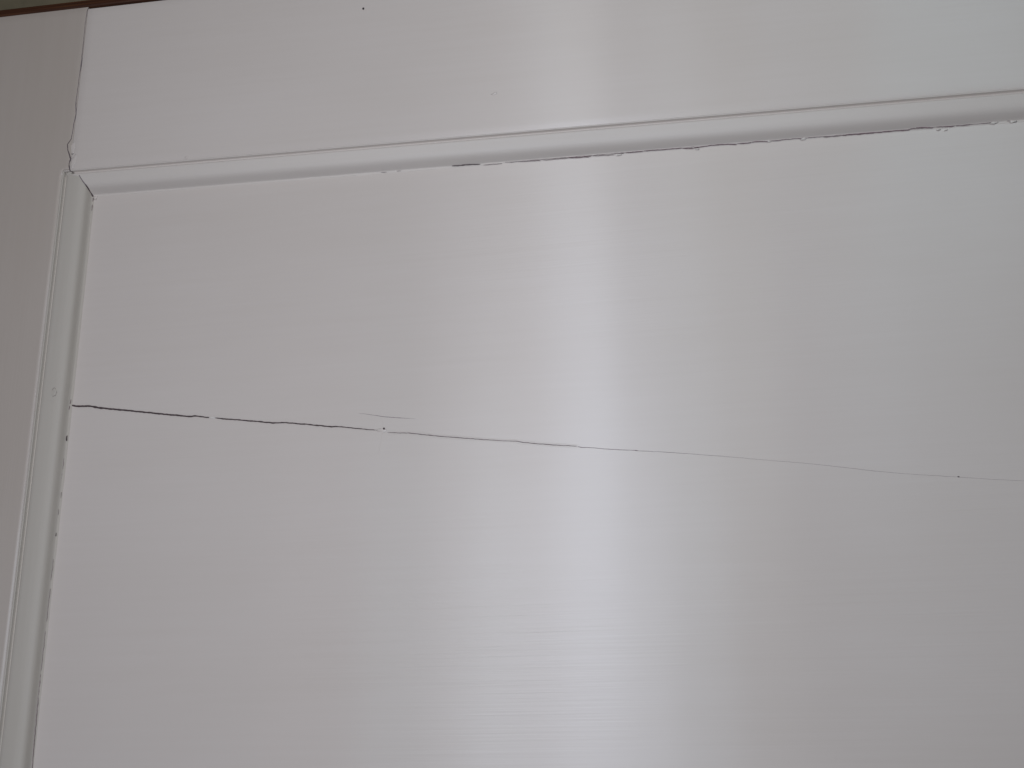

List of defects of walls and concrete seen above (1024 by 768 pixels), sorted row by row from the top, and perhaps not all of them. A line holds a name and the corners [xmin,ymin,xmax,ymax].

crack [66,7,97,211]
crack [69,401,1017,481]